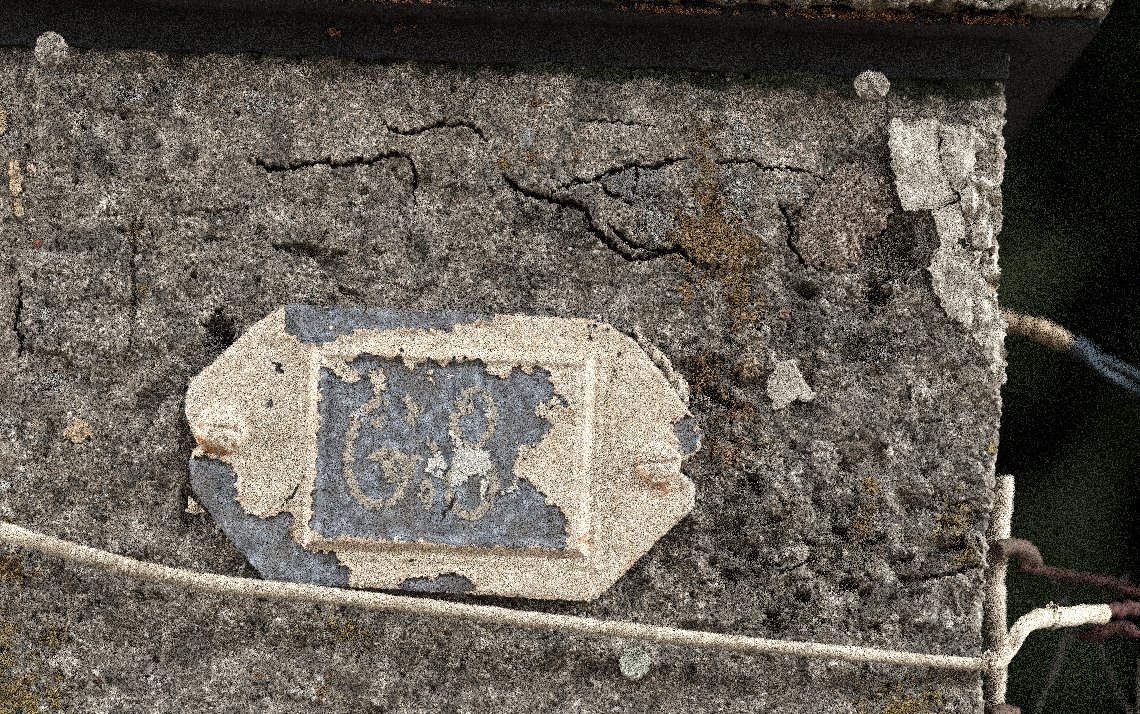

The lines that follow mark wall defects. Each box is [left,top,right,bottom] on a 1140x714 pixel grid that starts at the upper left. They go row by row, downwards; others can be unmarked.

crack [256,121,488,201]
crack [580,119,655,127]
crack [715,159,820,177]
crack [502,158,696,263]
crack [778,204,807,269]
peeling [861,114,1009,385]